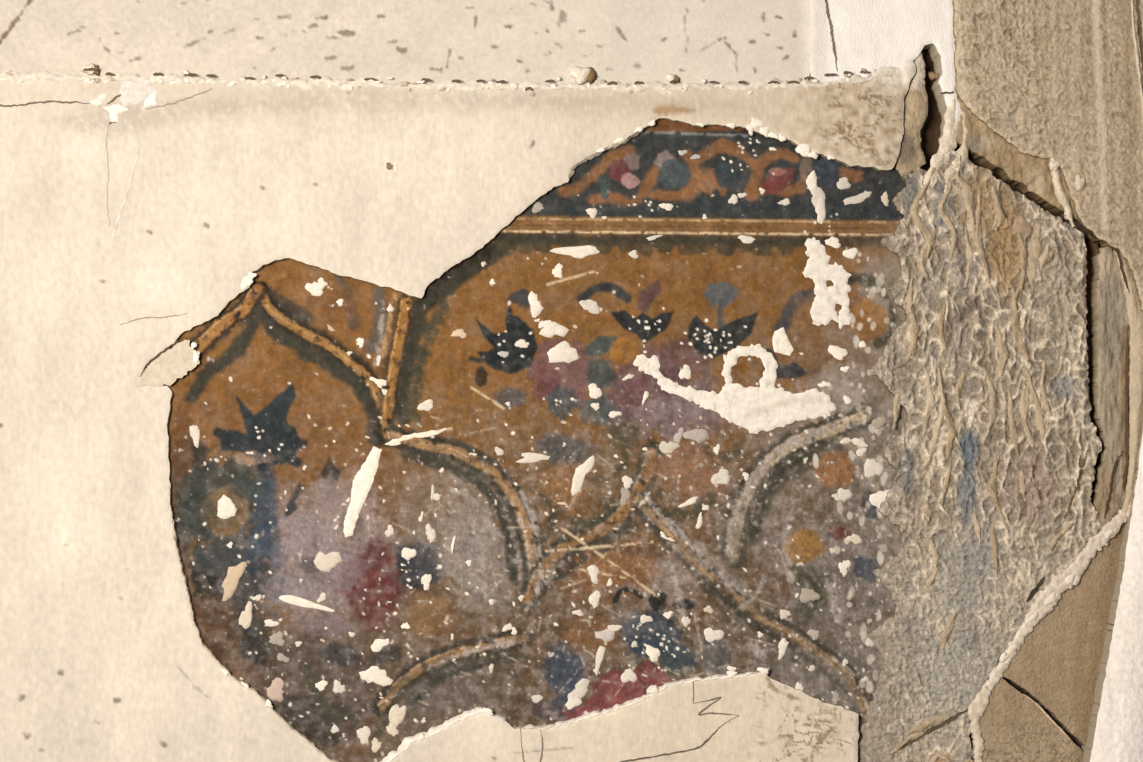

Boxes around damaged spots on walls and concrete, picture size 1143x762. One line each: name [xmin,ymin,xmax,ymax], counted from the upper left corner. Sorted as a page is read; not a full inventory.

flaking render [727,118,889,224]
flaking render [135,336,200,387]
peeling [528,291,579,363]
peeling [550,245,600,278]
peeling [622,327,852,434]
peeling [802,237,858,329]
crack [920,49,1130,523]
peeling [343,428,447,537]
flaking render [171,511,346,762]
peeling [967,502,1131,762]
flaking render [357,625,789,762]
crack [1003,678,1082,749]